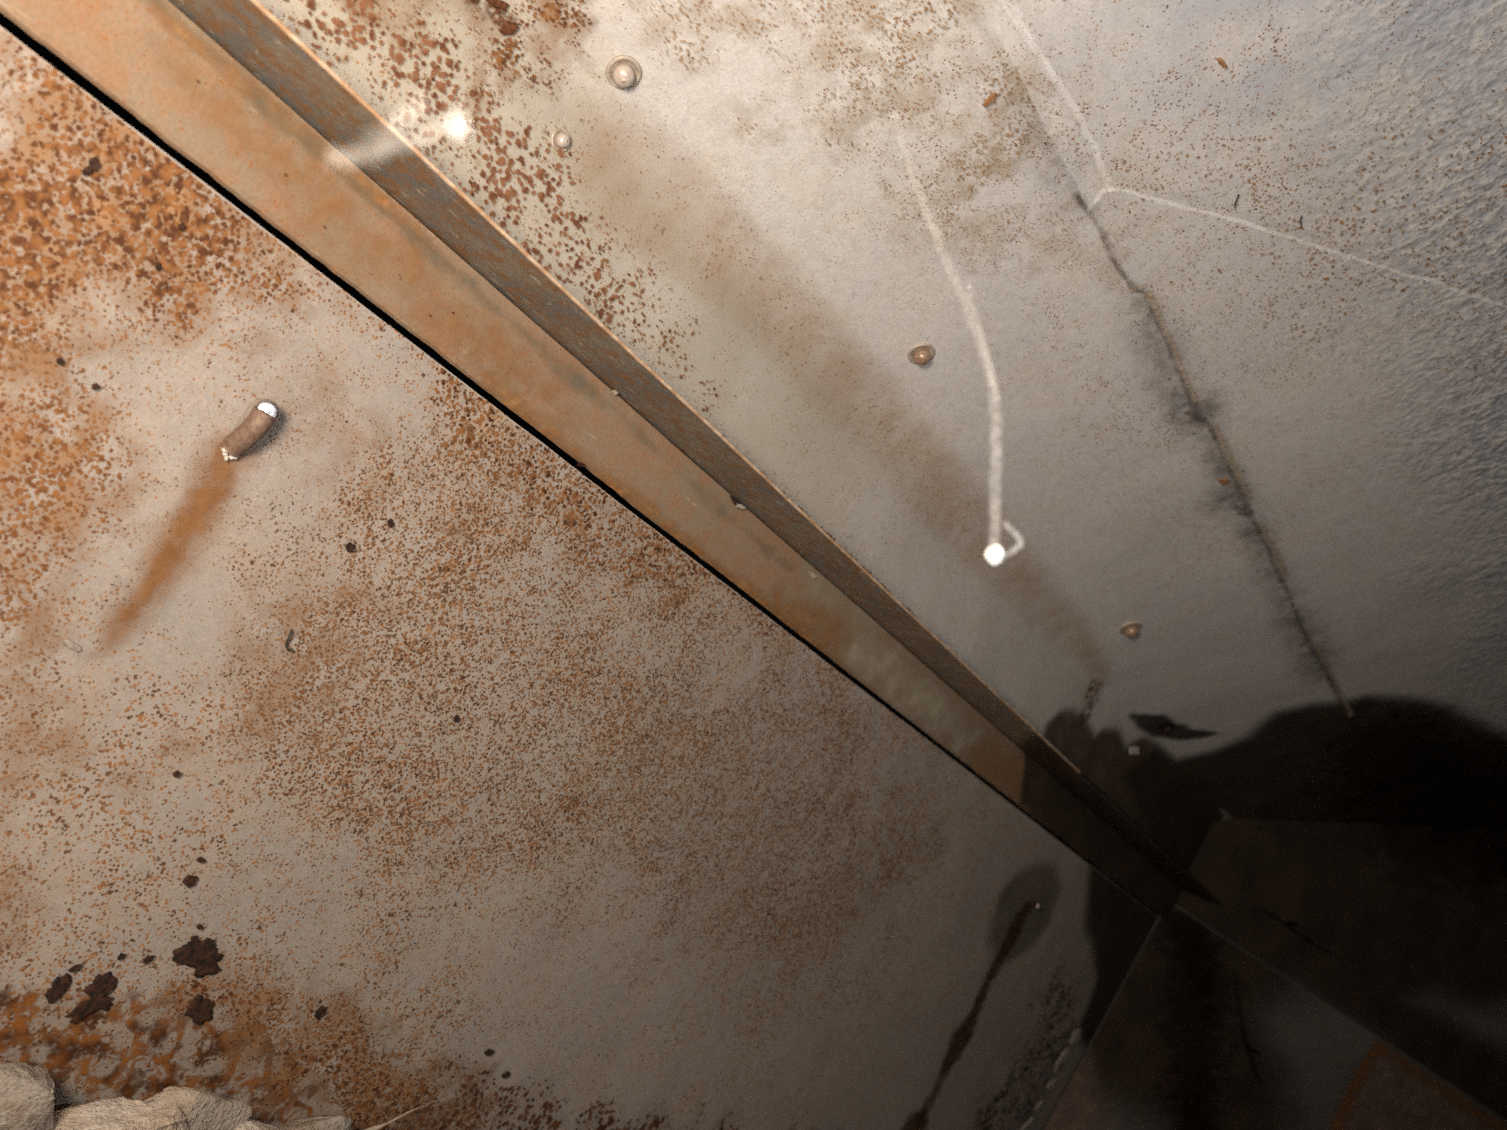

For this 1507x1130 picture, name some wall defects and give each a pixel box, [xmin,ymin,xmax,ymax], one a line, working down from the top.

corrosion [629,0,1180,285]
corrosion [1132,45,1507,402]
corrosion [0,0,952,1130]
water stain [903,903,1030,1130]